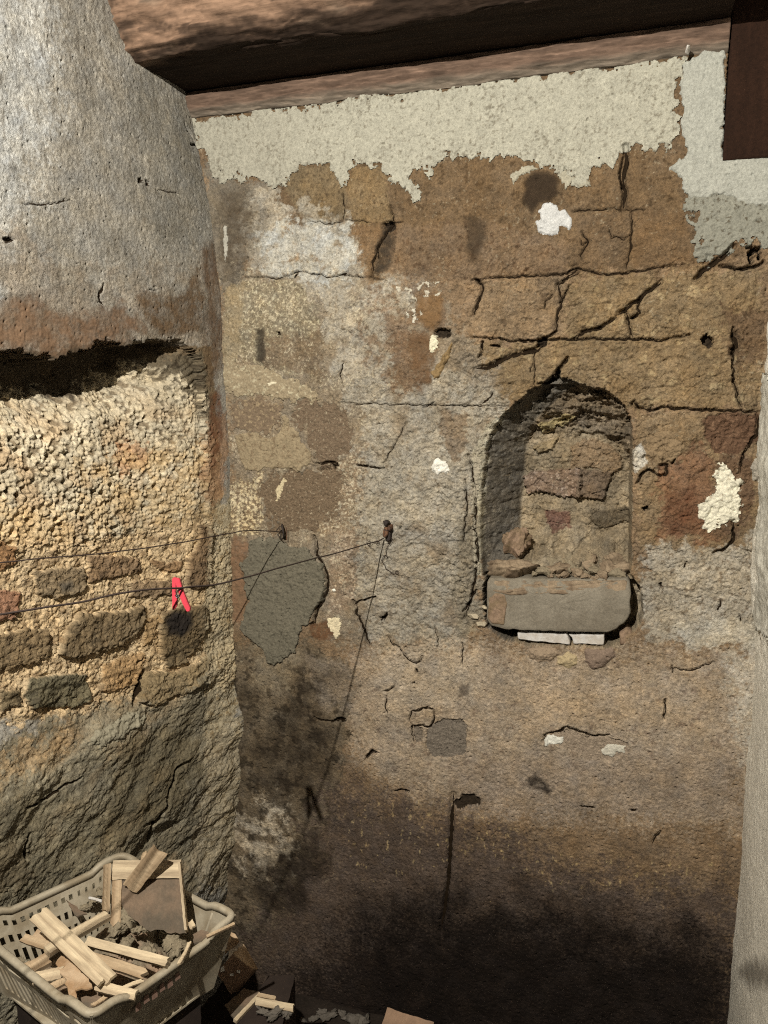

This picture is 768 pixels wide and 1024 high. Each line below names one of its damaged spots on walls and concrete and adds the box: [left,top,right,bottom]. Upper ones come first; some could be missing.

damp [523,173,557,211]
peeling [396,281,442,323]
crack [318,152,762,469]
flaking render [429,335,439,353]
spalling [0,336,213,549]
peeling [470,424,492,574]
spalling [414,718,467,757]
crack [544,726,605,739]
crack [441,793,454,929]